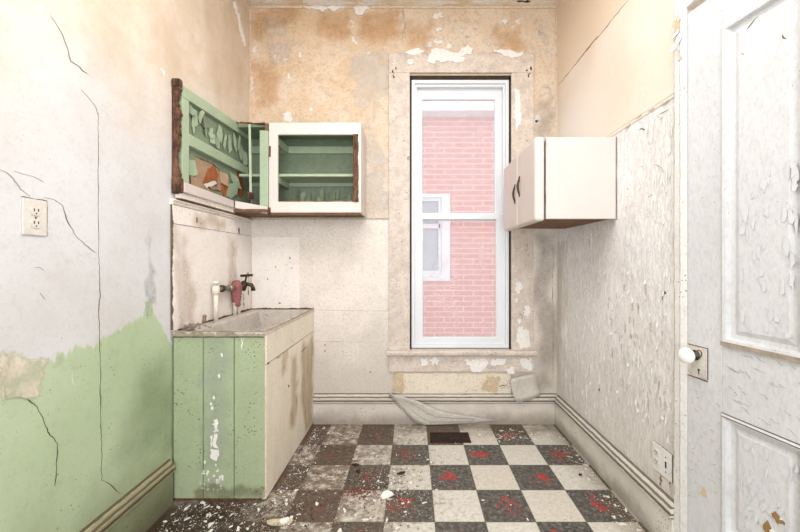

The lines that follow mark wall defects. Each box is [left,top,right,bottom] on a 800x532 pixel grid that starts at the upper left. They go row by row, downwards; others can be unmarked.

crack [51,17,86,73]
peeling [302,0,382,45]
peeling [403,0,477,65]
peeling [486,34,523,59]
crack [560,1,628,83]
peeling [194,157,228,197]
peeling [784,159,799,191]
crack [2,93,117,492]
peeling [462,275,534,388]
peeling [565,232,671,447]
peeling [200,419,224,491]
peeling [759,511,785,532]